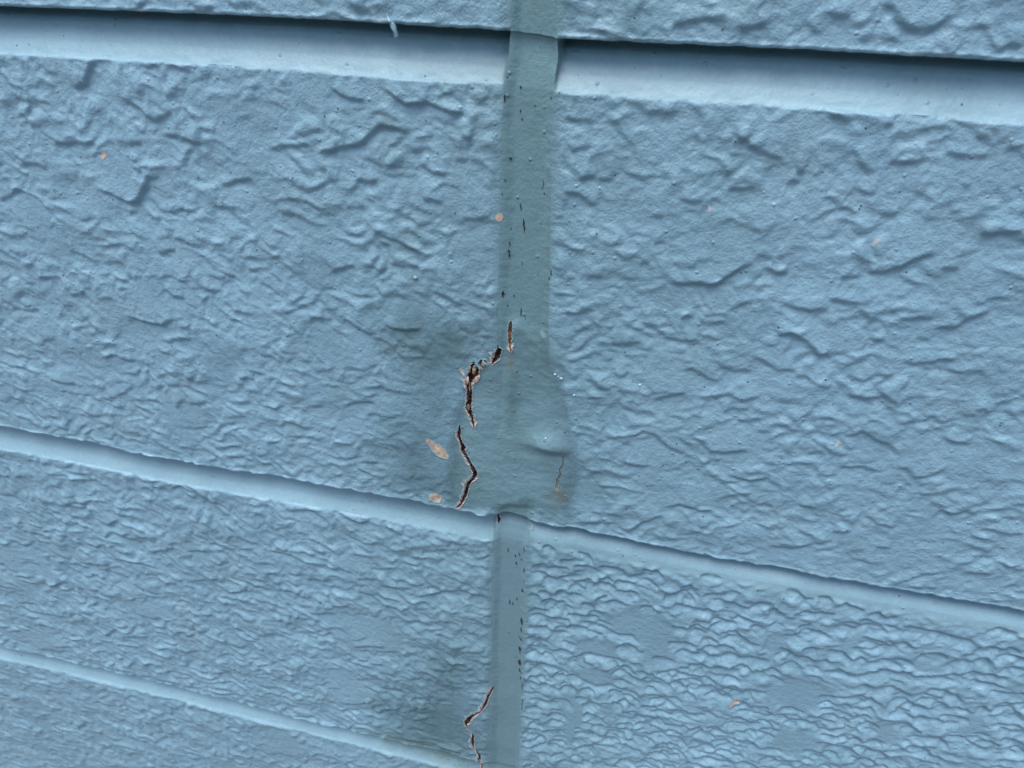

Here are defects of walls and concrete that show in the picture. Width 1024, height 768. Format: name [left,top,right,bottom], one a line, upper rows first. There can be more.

crack [502,146,545,257]
crack [455,290,526,509]
crack [463,685,495,768]